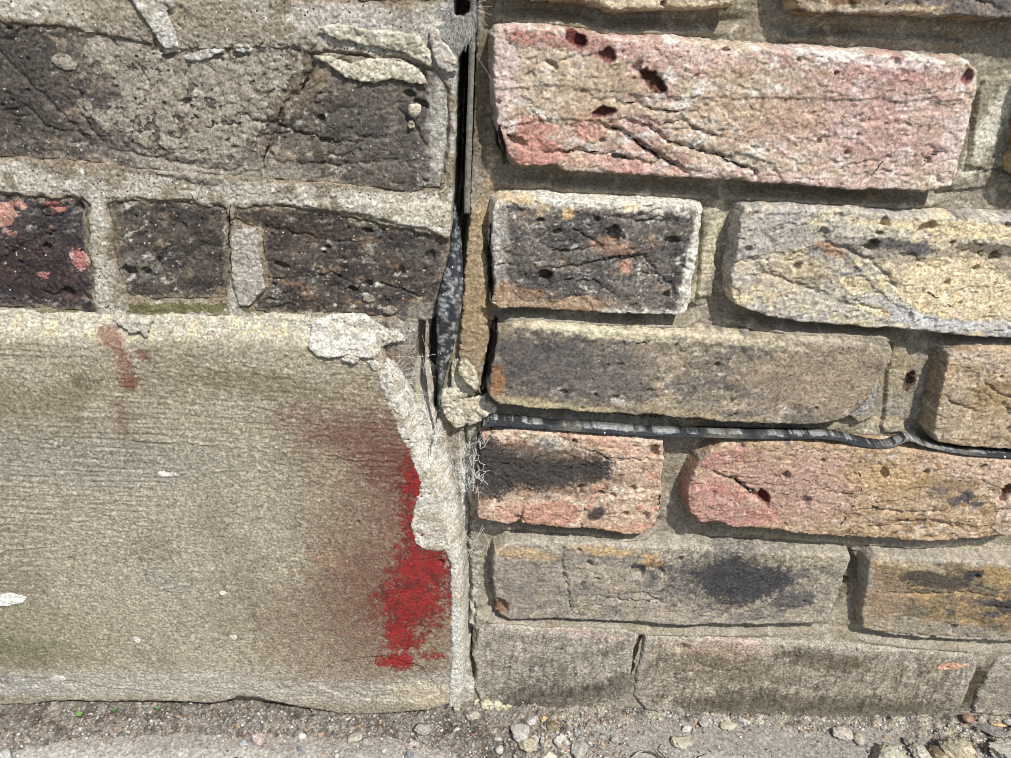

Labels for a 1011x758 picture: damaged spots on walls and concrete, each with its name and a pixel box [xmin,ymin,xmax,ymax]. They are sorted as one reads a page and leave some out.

crack [548,101,755,174]
peeling [388,329,405,343]
peeling [341,354,360,364]
crack [631,635,643,674]